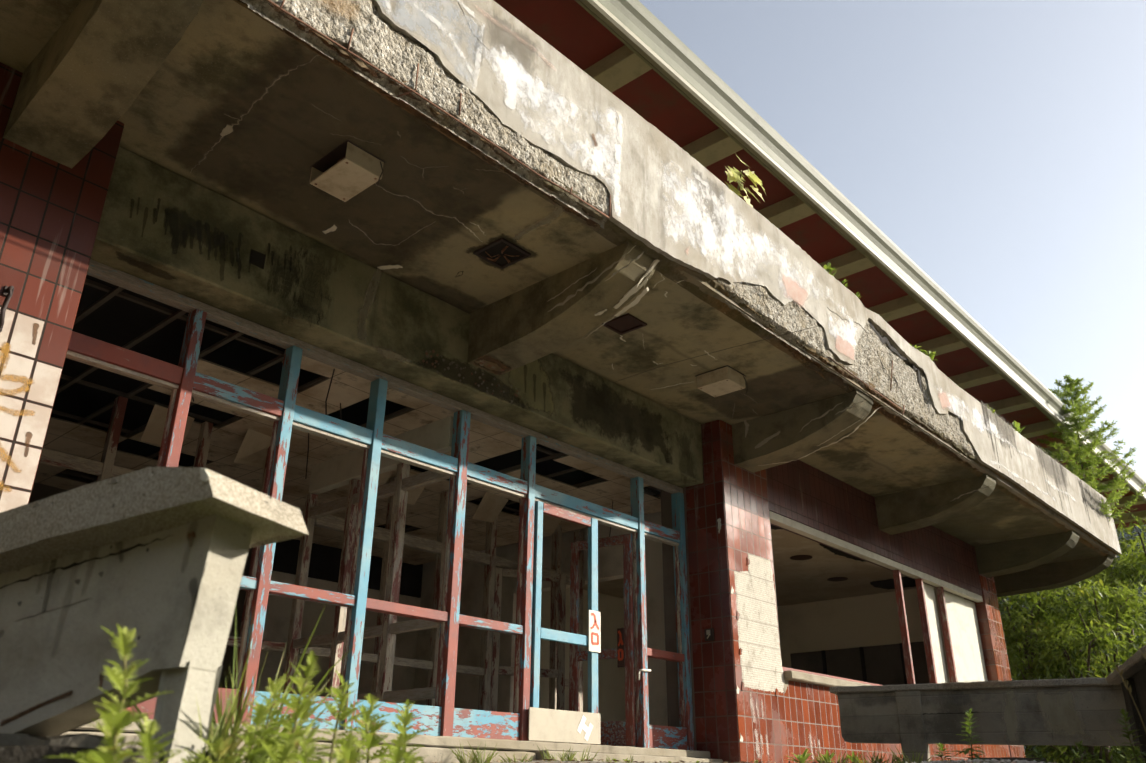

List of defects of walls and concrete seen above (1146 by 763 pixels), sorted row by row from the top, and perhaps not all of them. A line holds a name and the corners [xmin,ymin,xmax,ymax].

crack [190,55,319,173]
water stain [168,43,519,339]
corrosion [268,3,604,228]
spalling [233,0,1118,556]
corrosion [764,327,978,470]
peeling [731,553,789,697]